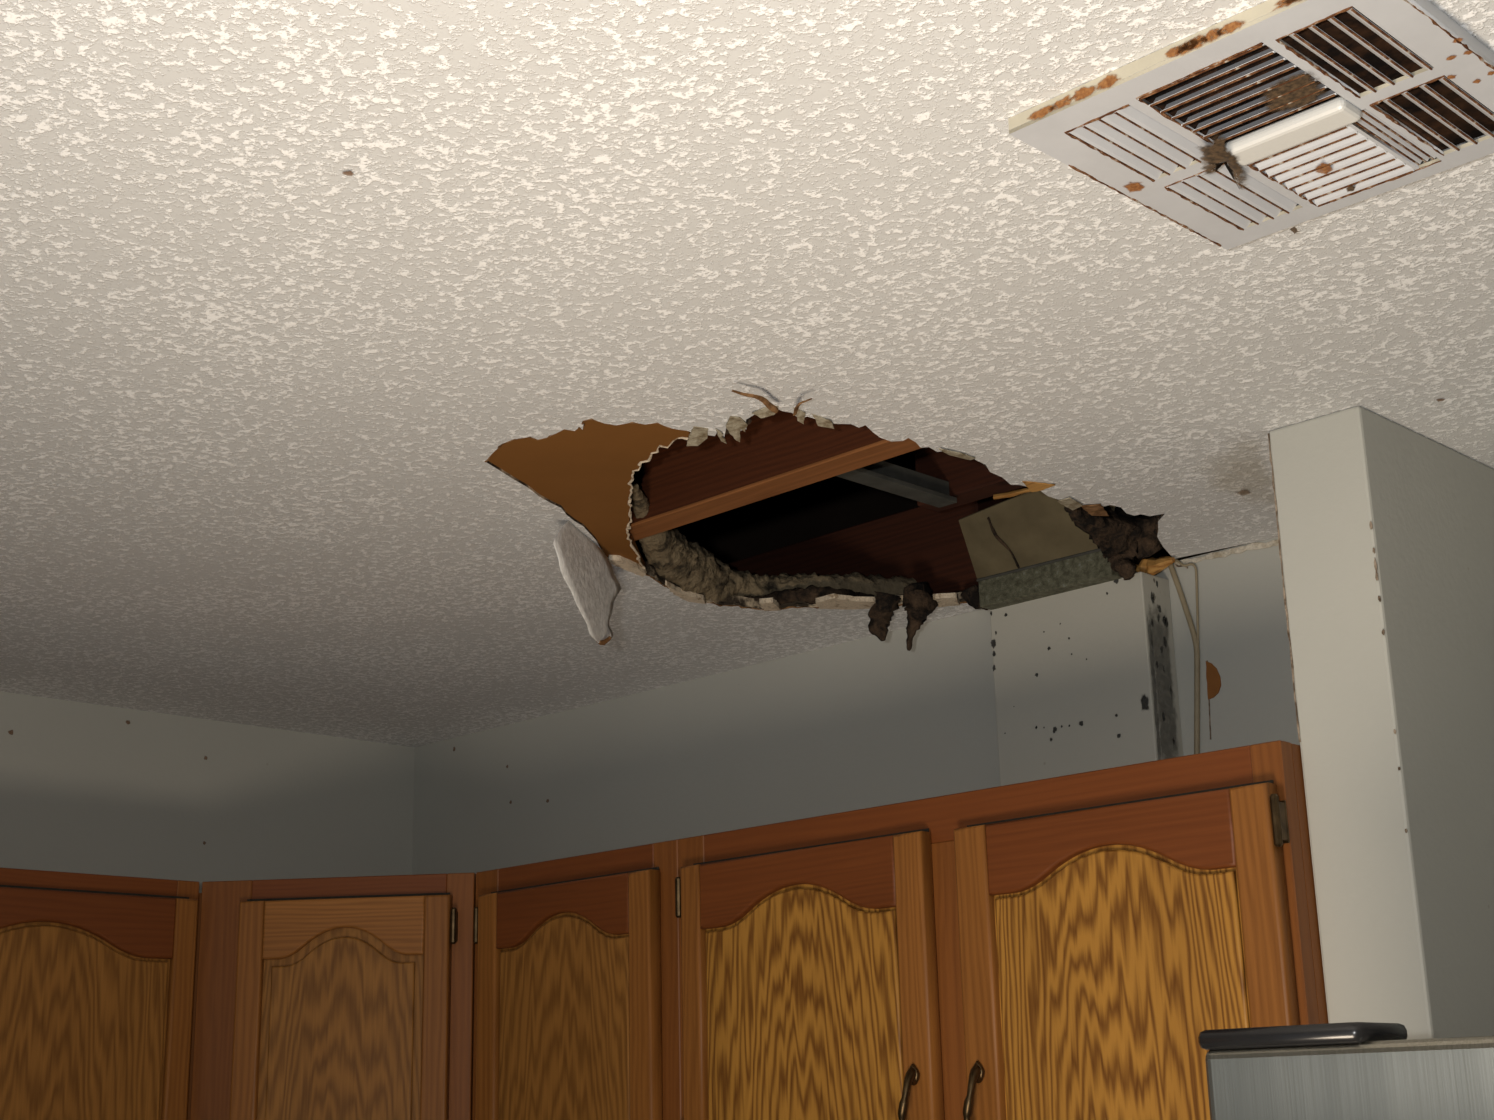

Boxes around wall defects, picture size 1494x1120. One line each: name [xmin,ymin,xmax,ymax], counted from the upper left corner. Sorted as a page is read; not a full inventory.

rust [1028,75,1118,119]
rust [1064,0,1494,247]
peeling [484,419,691,645]
peeling [665,580,706,604]
peeling [759,598,781,611]
peeling [815,594,876,610]
peeling [933,593,960,607]
water stain [1141,579,1177,759]